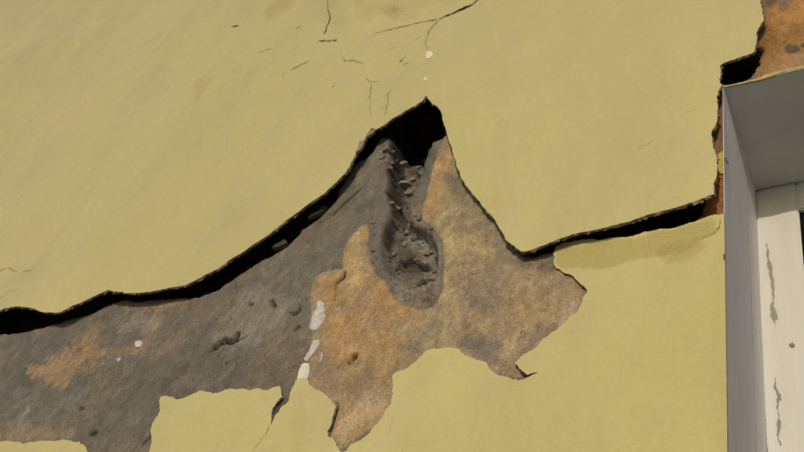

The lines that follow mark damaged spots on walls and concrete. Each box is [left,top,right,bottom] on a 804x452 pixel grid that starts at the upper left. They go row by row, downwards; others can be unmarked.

crack [376,0,477,65]
spalling [707,0,804,217]
spalling [0,100,587,452]
peeling [766,243,778,324]
peeling [774,378,782,446]